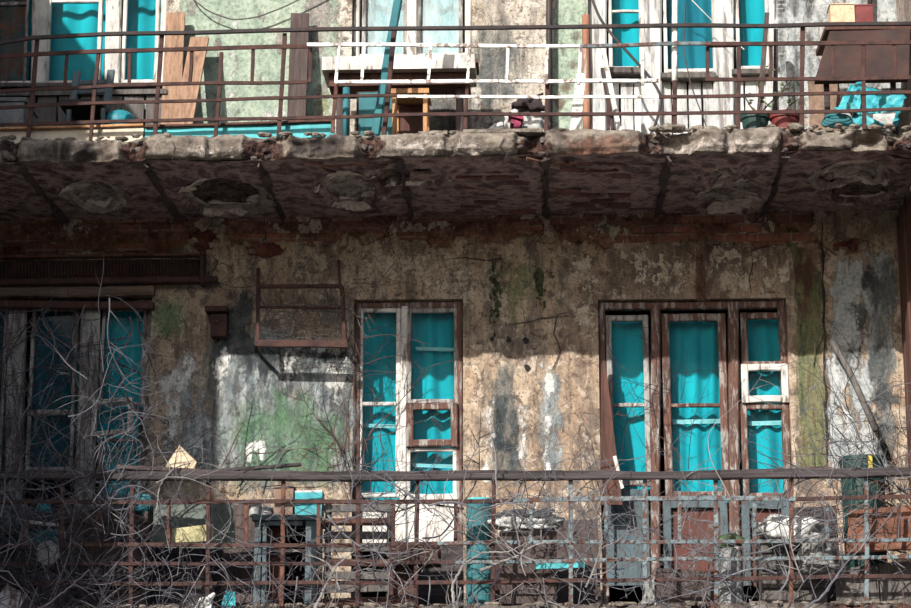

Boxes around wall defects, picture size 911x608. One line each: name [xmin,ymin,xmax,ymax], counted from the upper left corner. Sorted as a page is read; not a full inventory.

spalling [59,179,127,214]
peeling [193,145,241,158]
peeling [394,138,479,155]
water stain [158,289,355,488]
water stain [482,366,527,487]
spalling [178,160,899,482]
water stain [868,260,898,464]